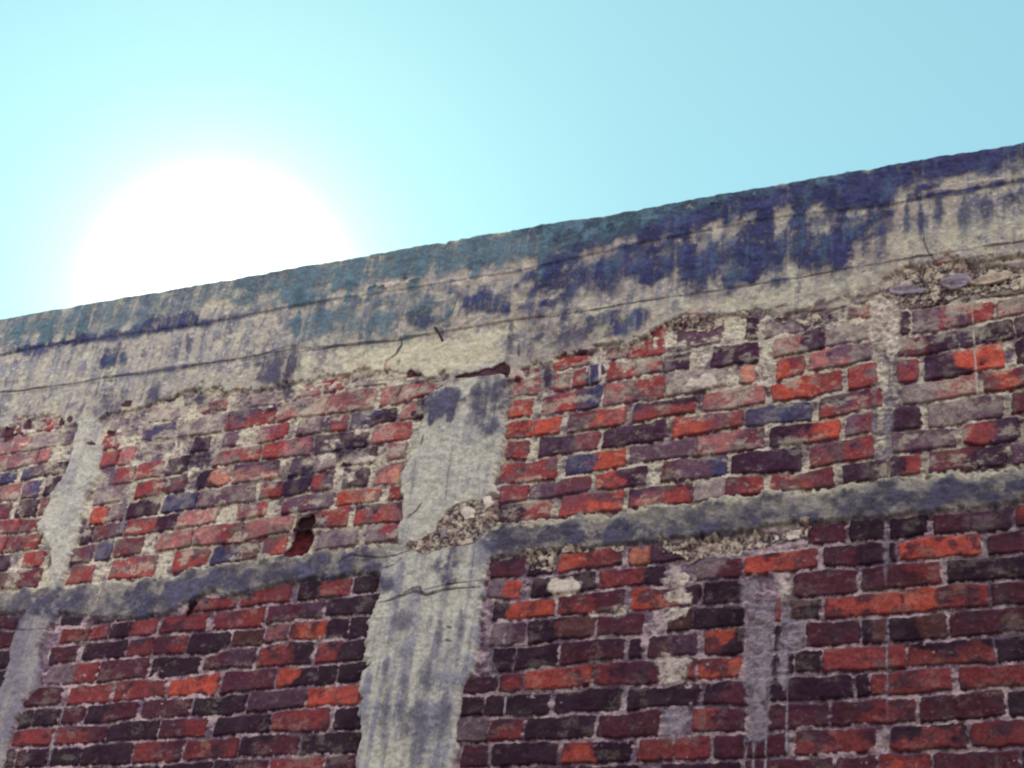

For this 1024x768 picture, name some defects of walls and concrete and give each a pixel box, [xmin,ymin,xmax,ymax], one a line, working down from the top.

water stain [0,142,1024,400]
spalling [883,253,1024,307]
spalling [672,313,723,333]
crack [1,335,438,402]
spalling [4,419,32,442]
water stain [424,378,509,434]
spalling [284,515,316,558]
spalling [407,492,500,555]
water stain [0,546,393,620]
crack [378,581,483,603]
water stain [547,577,580,596]
water stain [662,570,692,622]